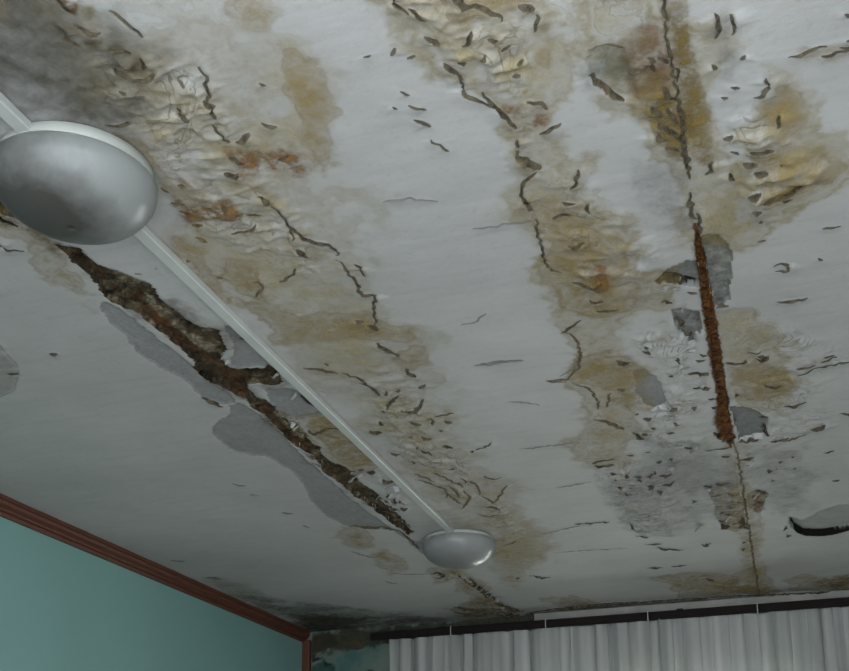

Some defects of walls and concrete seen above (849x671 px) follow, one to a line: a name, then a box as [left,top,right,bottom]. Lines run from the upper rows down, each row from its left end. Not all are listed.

damp [0,0,110,123]
crack [177,67,278,180]
damp [217,143,304,187]
crack [231,196,400,357]
crack [363,0,625,430]
spalling [586,44,640,103]
corrosion [636,69,711,162]
spalling [655,234,733,306]
corrosion [693,223,736,447]
spalling [55,244,424,554]
peeling [632,369,679,434]
crack [431,385,849,618]